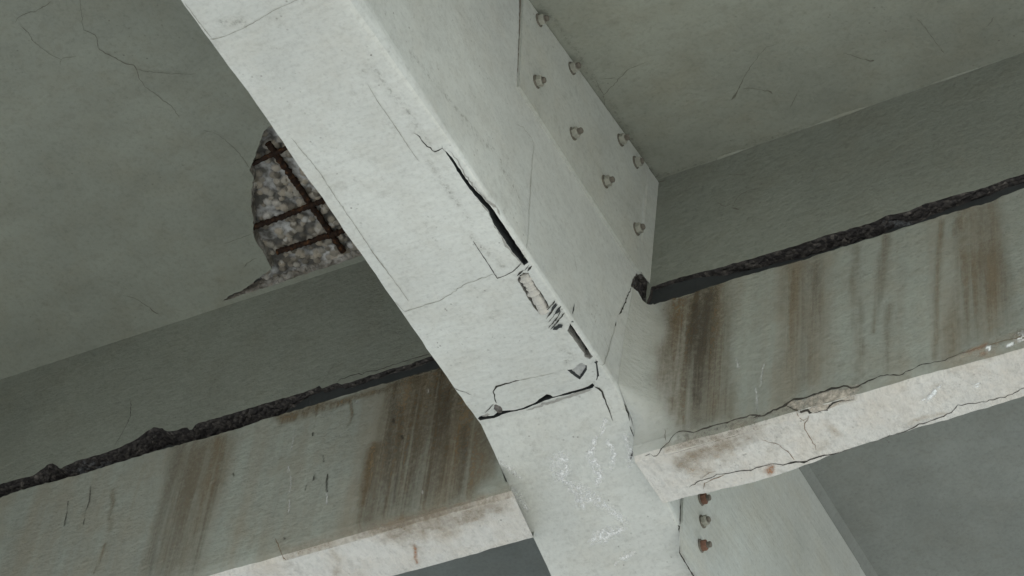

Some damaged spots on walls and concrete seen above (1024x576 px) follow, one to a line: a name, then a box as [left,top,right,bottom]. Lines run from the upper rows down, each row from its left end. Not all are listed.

spalling [224,125,362,300]
spalling [631,174,1024,305]
spalling [0,356,440,498]
crack [456,289,1024,489]